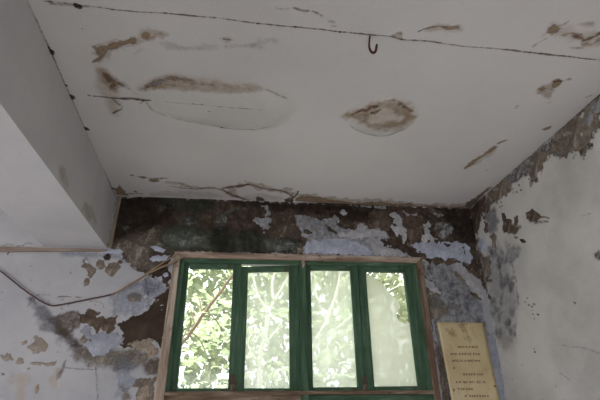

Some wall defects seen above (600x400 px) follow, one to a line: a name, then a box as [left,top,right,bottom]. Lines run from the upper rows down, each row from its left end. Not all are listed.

peeling [92,32,150,63]
crack [99,7,596,60]
water stain [164,198,211,211]
water stain [162,226,300,253]
flaking render [51,94,600,400]
peeling [22,335,48,354]
water stain [30,298,134,370]
peeling [0,353,57,370]